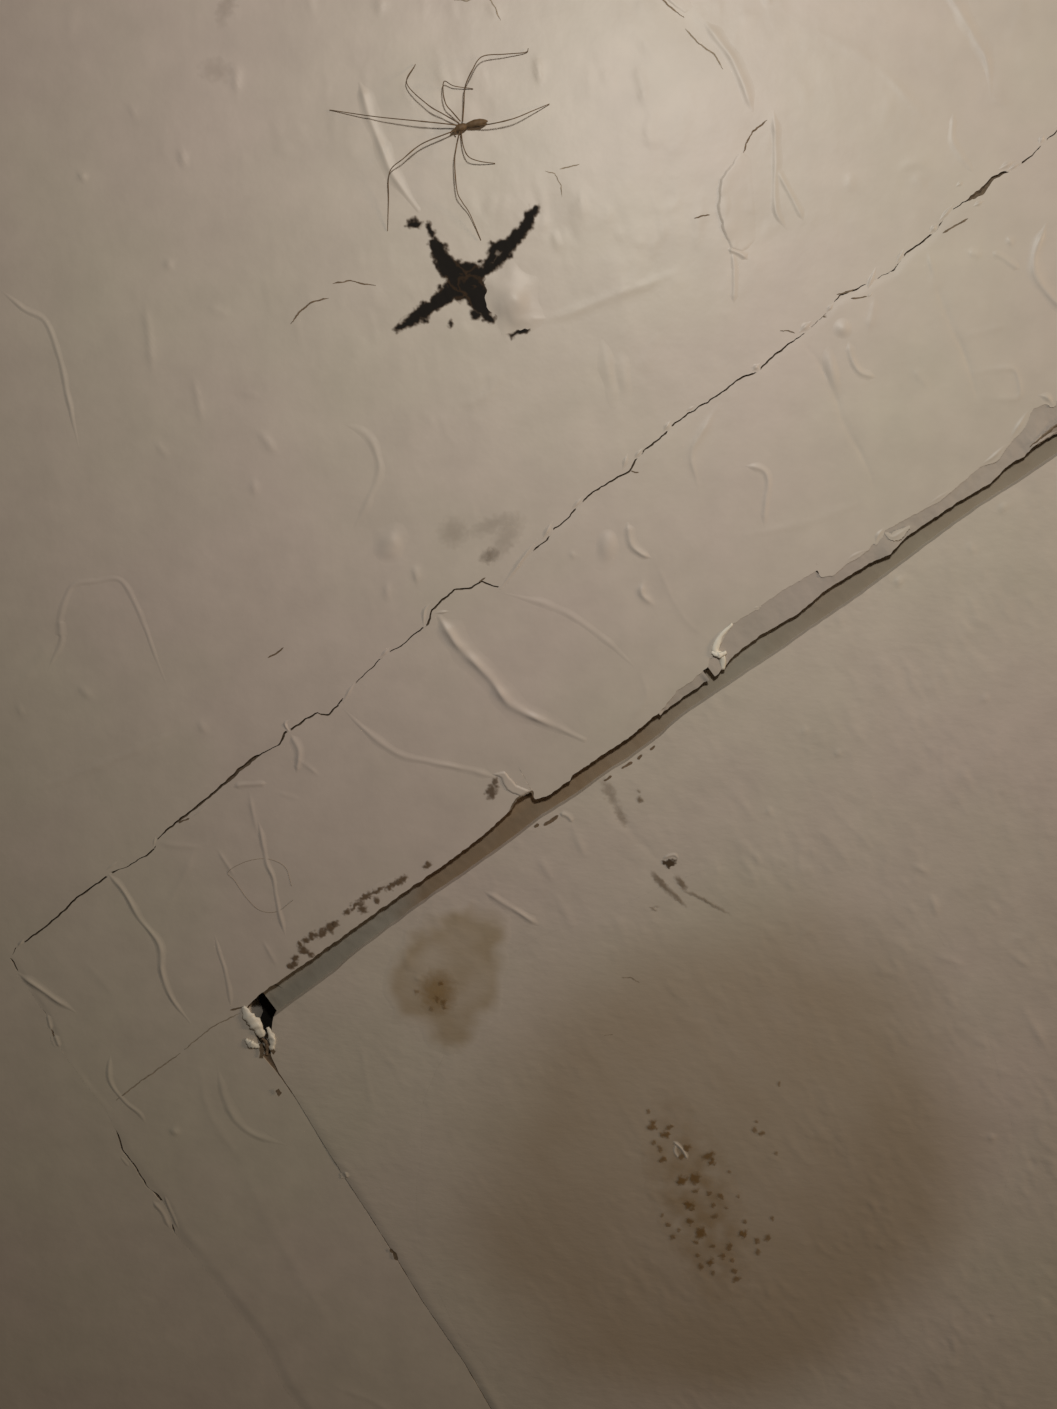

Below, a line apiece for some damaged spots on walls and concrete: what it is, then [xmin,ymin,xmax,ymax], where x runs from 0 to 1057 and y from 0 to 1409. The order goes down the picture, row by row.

crack [743,120,767,153]
crack [12,125,1057,1049]
flaking render [659,392,1057,715]
flaking render [534,810,575,828]
crack [117,1014,237,1231]
crack [263,1054,489,1405]
water stain [382,864,1013,1409]